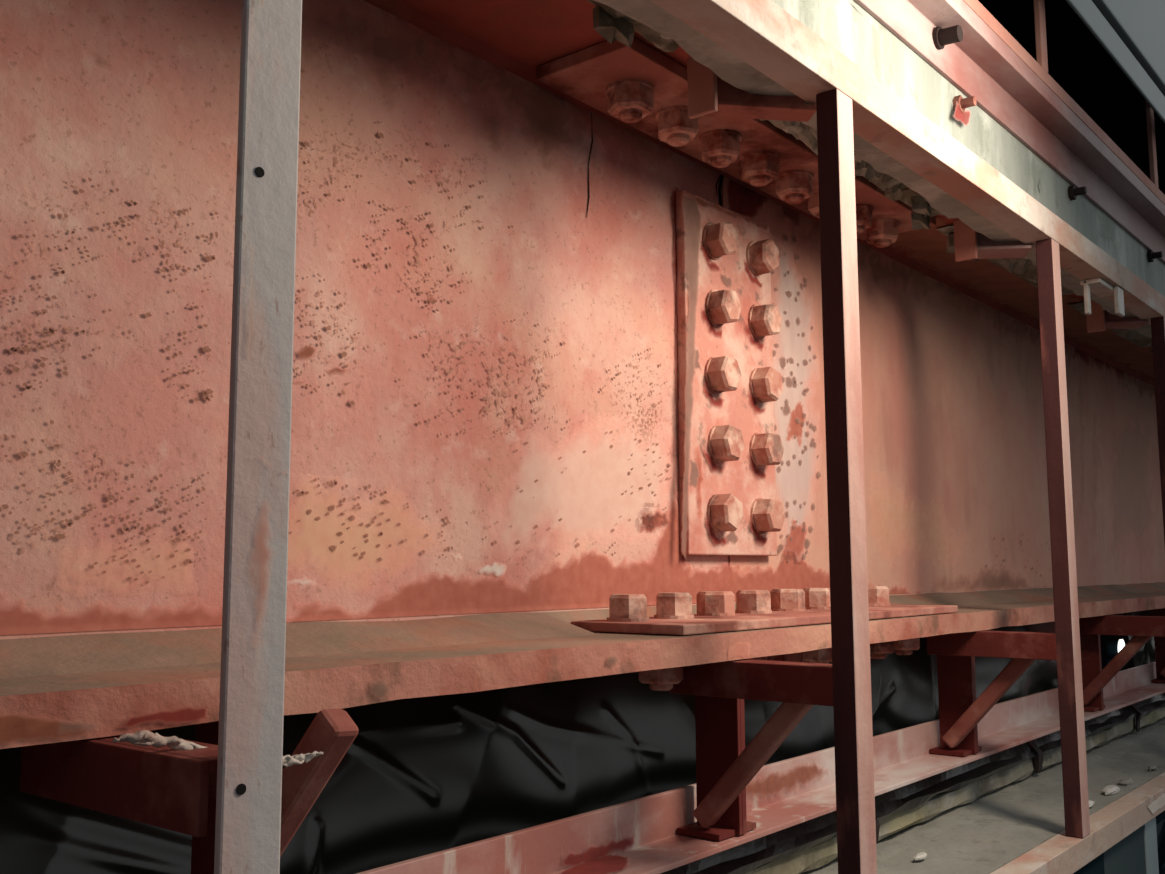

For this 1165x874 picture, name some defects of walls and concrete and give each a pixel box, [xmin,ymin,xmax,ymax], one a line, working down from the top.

rust [52,200,218,292]
rust [357,200,472,312]
crack [585,113,593,218]
spalling [759,119,818,156]
spalling [854,152,965,254]
spalling [972,258,1038,288]
rust [0,274,71,396]
rust [295,273,360,406]
peeling [286,235,830,622]
rust [0,434,130,539]
peeling [0,604,222,635]
peeling [1148,793,1165,813]